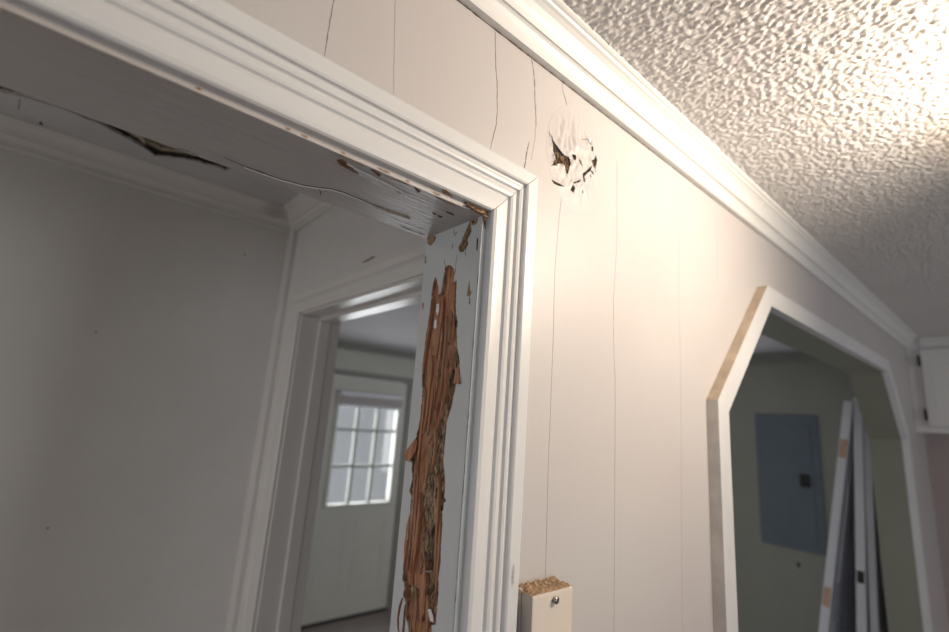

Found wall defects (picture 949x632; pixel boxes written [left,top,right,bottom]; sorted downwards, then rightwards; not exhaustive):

peeling [331,151,421,196]
spalling [549,133,596,192]